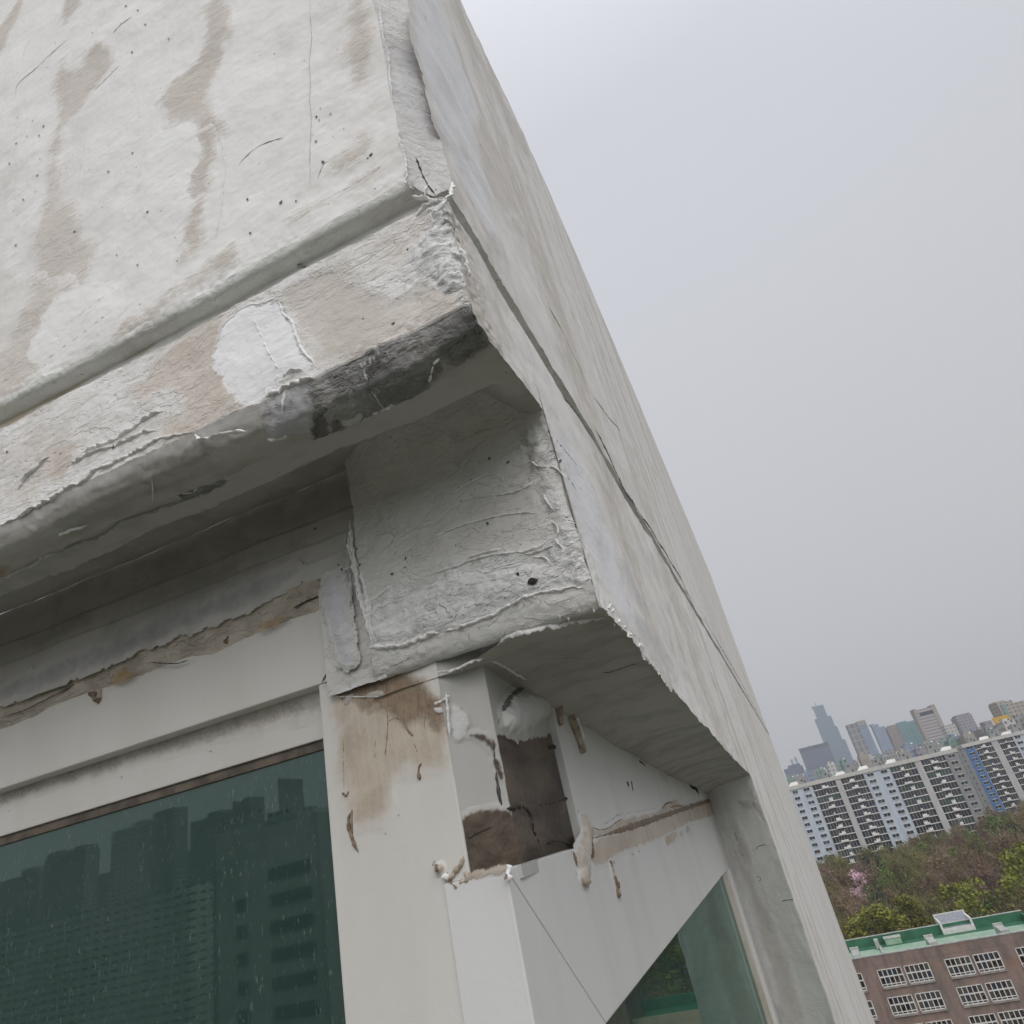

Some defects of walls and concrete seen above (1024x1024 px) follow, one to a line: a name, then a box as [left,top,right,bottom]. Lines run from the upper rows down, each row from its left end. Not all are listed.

peeling [266,255,491,440]
peeling [35,425,90,496]
spalling [177,478,231,501]
crack [562,395,767,730]
leakage [0,666,453,841]
peeling [434,694,451,737]